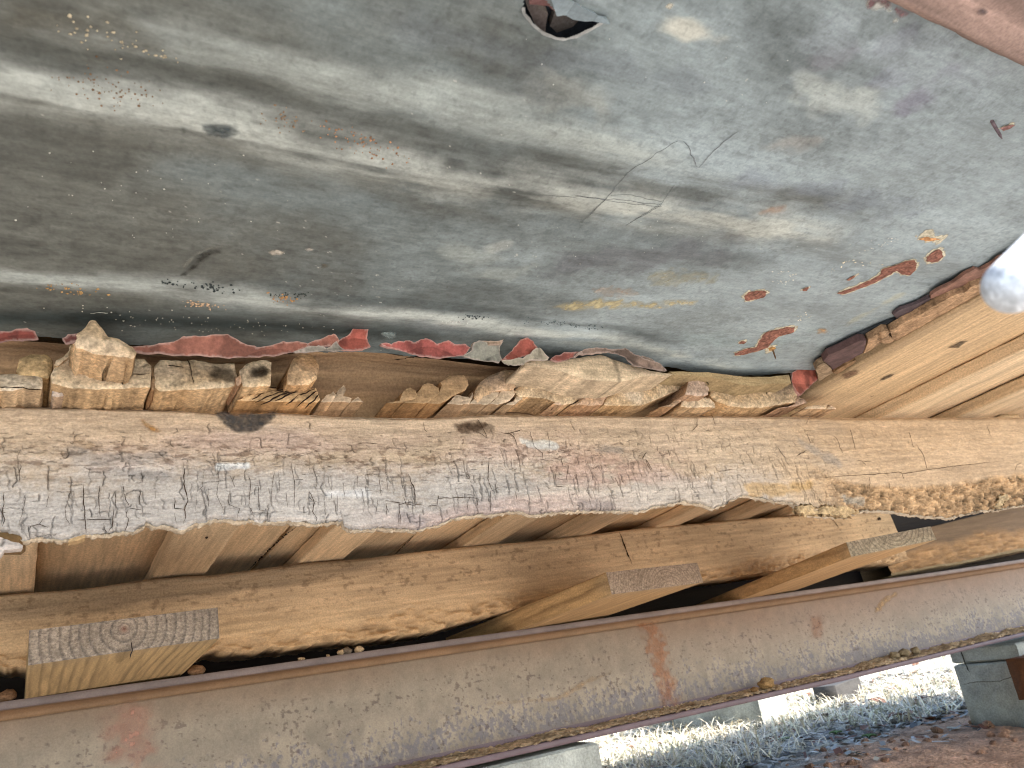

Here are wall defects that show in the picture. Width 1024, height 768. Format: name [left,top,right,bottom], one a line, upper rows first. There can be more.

leakage [205,126,235,137]
peeling [0,328,39,343]
peeling [502,338,537,360]
peeling [550,352,578,363]
crack [834,430,1020,488]
crack [2,419,578,571]